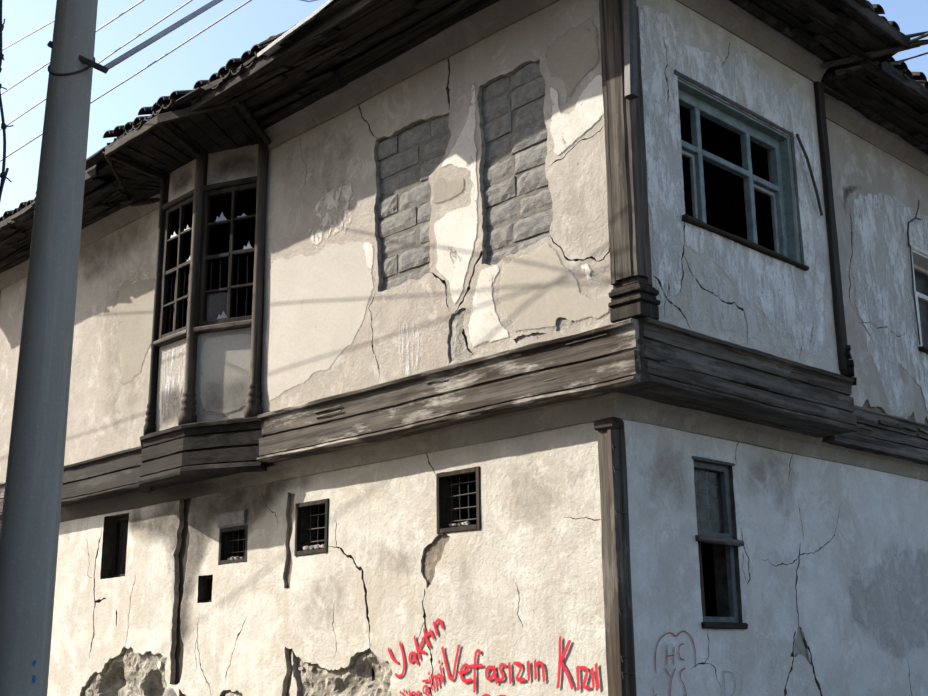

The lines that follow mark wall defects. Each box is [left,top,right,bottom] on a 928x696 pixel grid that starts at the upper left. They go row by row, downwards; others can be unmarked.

peeling [434,59,611,363]
crack [653,224,748,341]
peeling [853,192,928,424]
flaking render [80,500,186,696]
spalling [283,492,295,589]
flaking render [282,647,393,696]
crack [329,523,370,644]
crack [417,589,433,693]
flaking render [421,534,450,588]
crack [741,509,840,696]